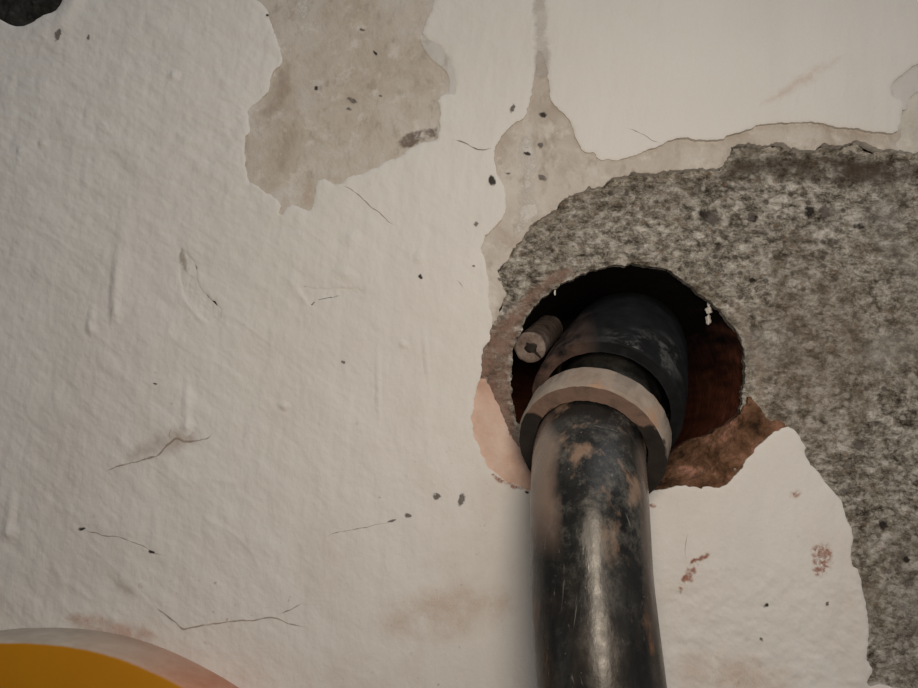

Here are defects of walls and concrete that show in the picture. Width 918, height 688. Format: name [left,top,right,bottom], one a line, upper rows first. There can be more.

peeling [245,0,457,215]
crack [112,438,208,469]
spalling [471,52,918,688]
crack [159,607,297,630]